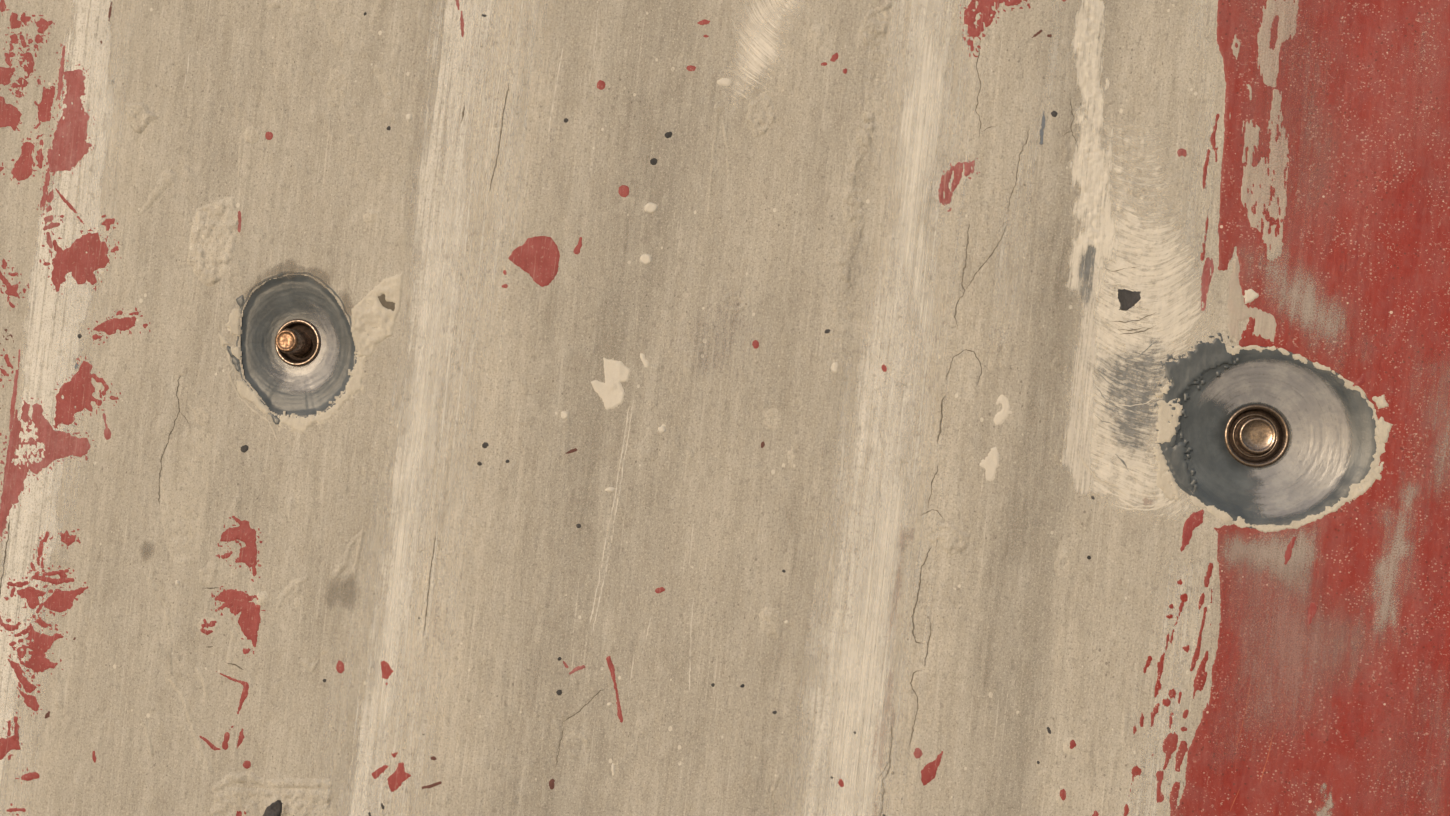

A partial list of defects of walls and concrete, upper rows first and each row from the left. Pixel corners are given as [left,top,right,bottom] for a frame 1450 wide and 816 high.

peeling [1,251,30,298]
peeling [31,76,67,217]
peeling [1229,0,1299,261]
peeling [1153,256,1393,533]